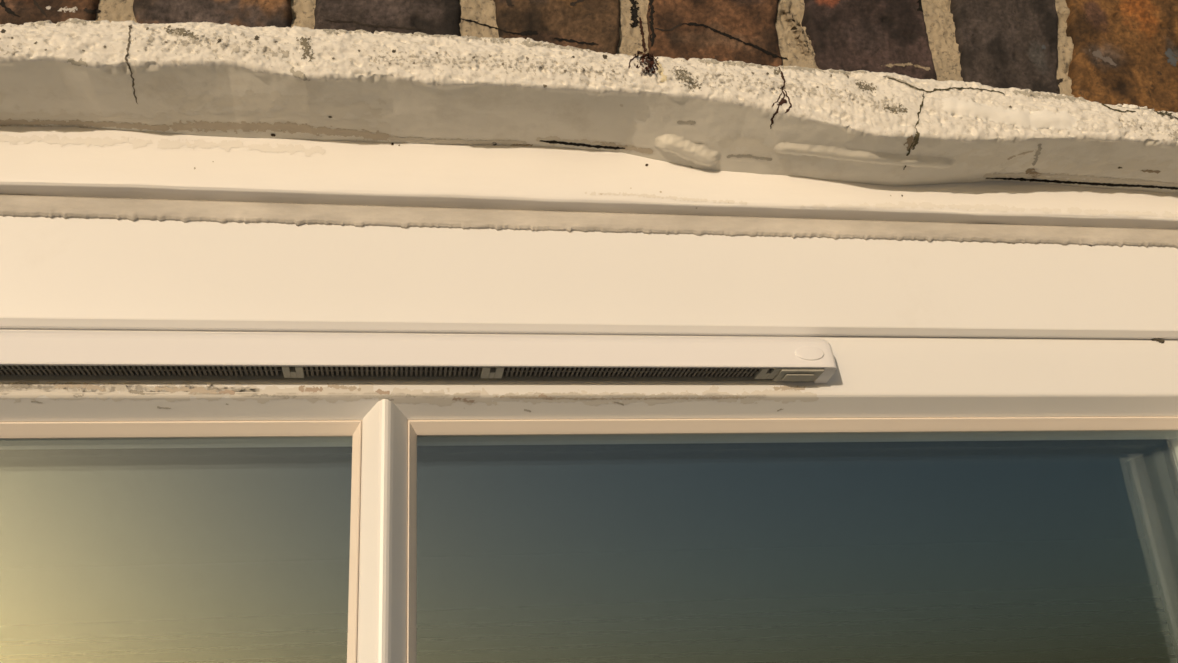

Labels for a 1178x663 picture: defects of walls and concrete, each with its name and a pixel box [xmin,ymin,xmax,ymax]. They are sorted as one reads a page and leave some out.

crack [0,0,47,17]
crack [125,25,138,104]
crack [648,0,792,129]
crack [540,140,625,150]
crack [883,76,1005,168]